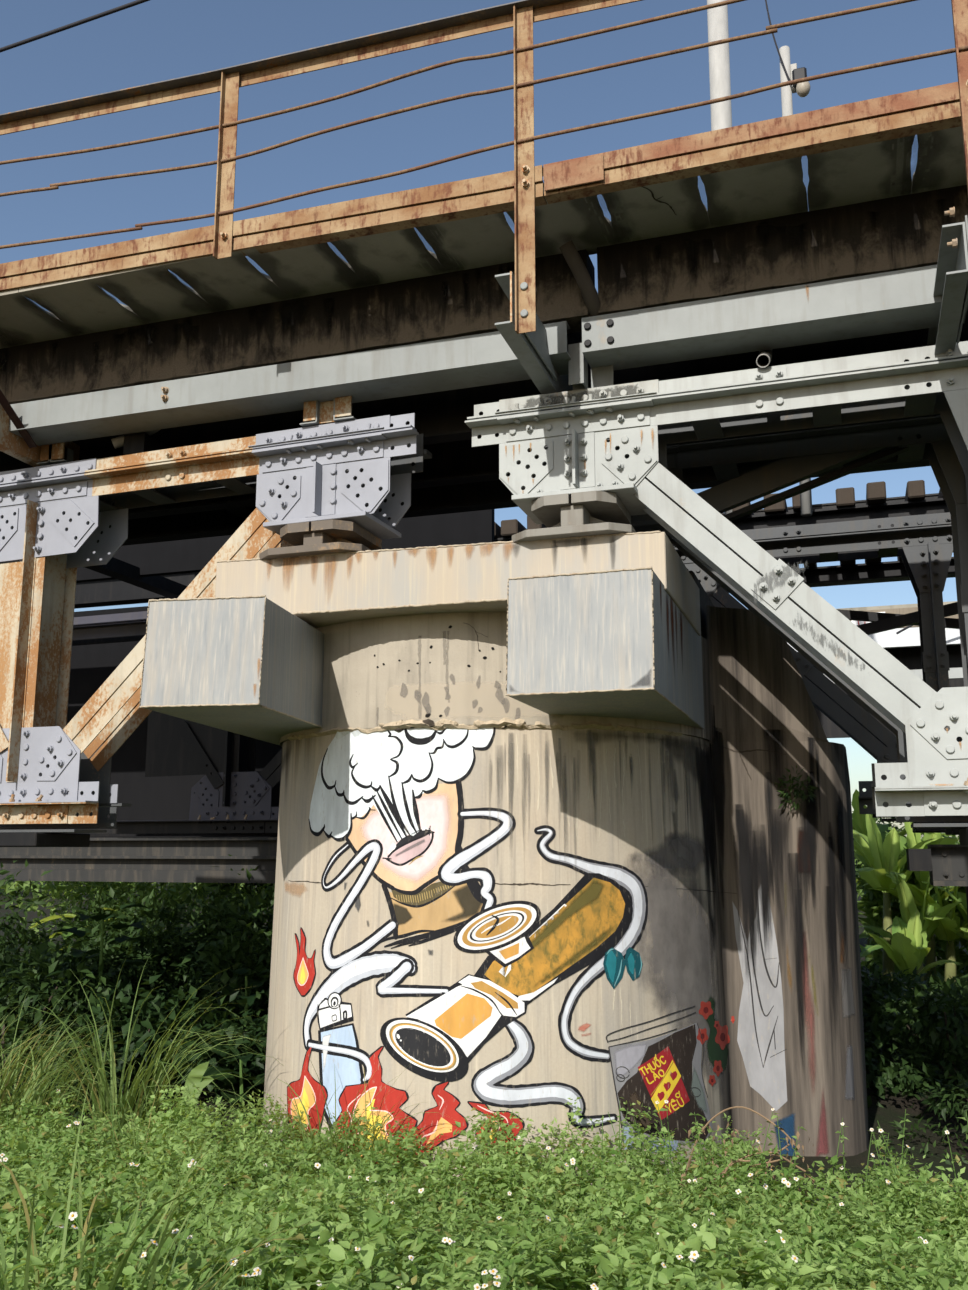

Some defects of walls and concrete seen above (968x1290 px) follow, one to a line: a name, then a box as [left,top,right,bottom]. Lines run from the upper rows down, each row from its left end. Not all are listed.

water stain [511,710,847,1075]